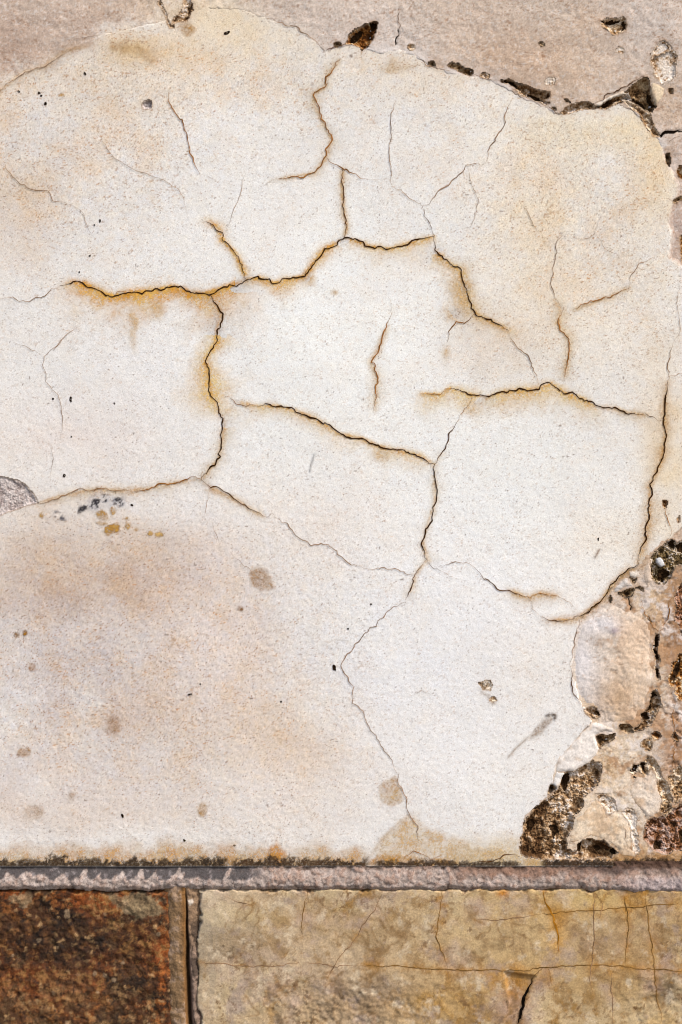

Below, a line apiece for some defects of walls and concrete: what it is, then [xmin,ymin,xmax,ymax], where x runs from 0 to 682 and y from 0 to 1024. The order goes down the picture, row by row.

spalling [157,0,194,29]
spalling [333,21,379,51]
spalling [600,17,627,54]
spalling [428,40,678,137]
rust [75,224,337,309]
spalling [0,476,39,516]
crack [2,61,682,860]
spalling [608,539,682,635]
spalling [519,633,682,861]
crack [197,892,681,1023]